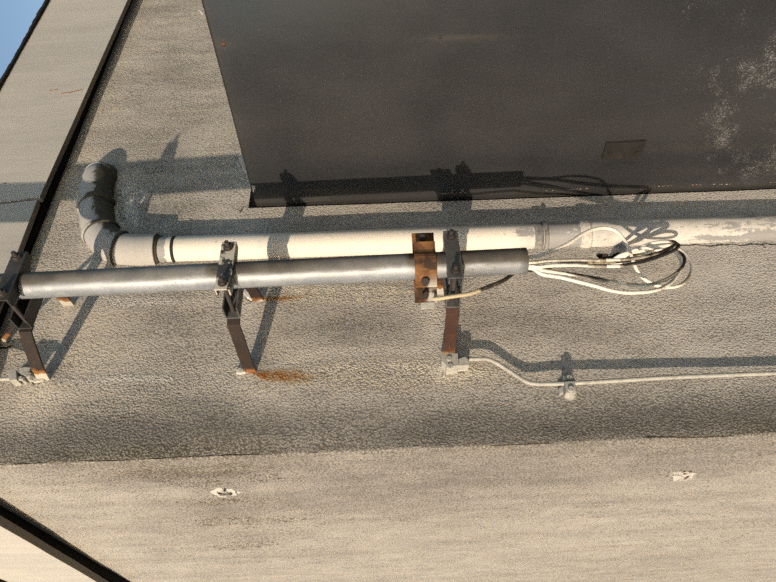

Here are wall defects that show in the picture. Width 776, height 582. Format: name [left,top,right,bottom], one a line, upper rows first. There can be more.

corrosion [252,371,307,382]
spalling [210,487,242,498]